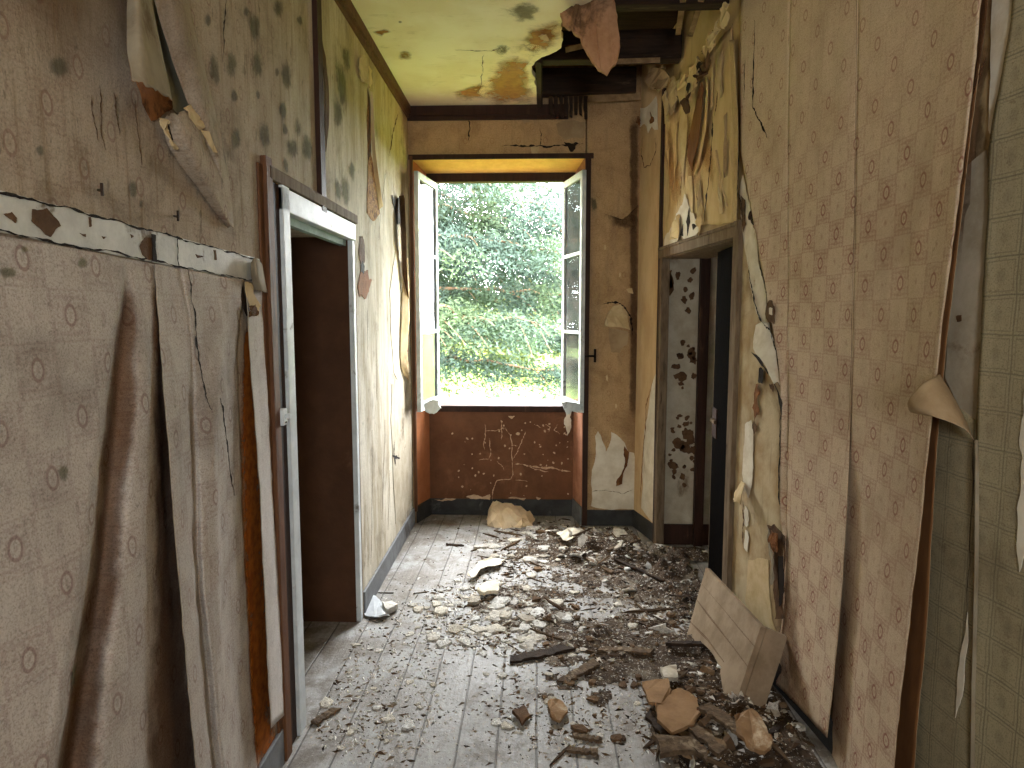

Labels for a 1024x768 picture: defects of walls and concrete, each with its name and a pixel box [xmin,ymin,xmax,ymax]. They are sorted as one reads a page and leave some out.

spalling [31,208,61,237]
flaking render [136,0,188,121]
water stain [280,104,311,171]
water stain [335,51,350,125]
water stain [336,163,354,202]
water stain [459,6,557,102]
crack [504,131,578,152]
crack [729,20,767,222]
crack [0,192,254,489]
crack [480,423,571,498]
flaking render [591,374,656,522]
flaking render [742,384,786,631]